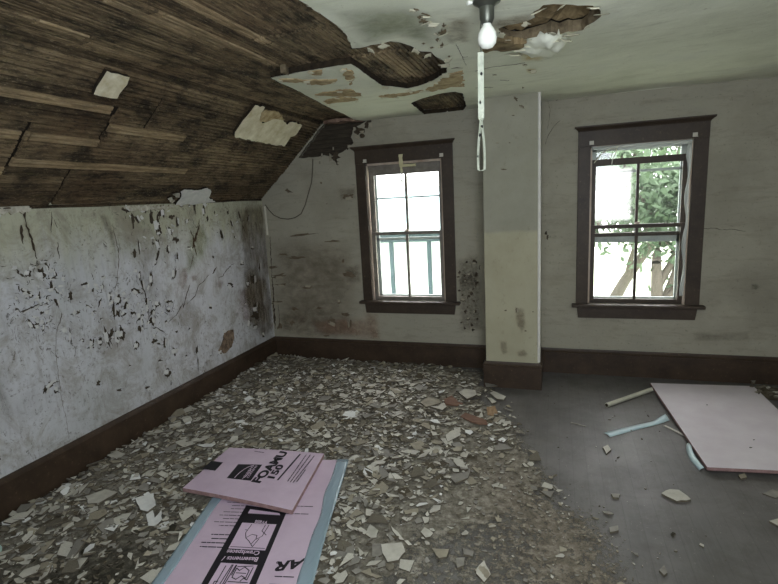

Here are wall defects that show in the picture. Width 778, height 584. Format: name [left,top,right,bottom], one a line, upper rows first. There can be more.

spalling [271,8,466,165]
spalling [482,4,609,53]
peeling [0,202,249,368]